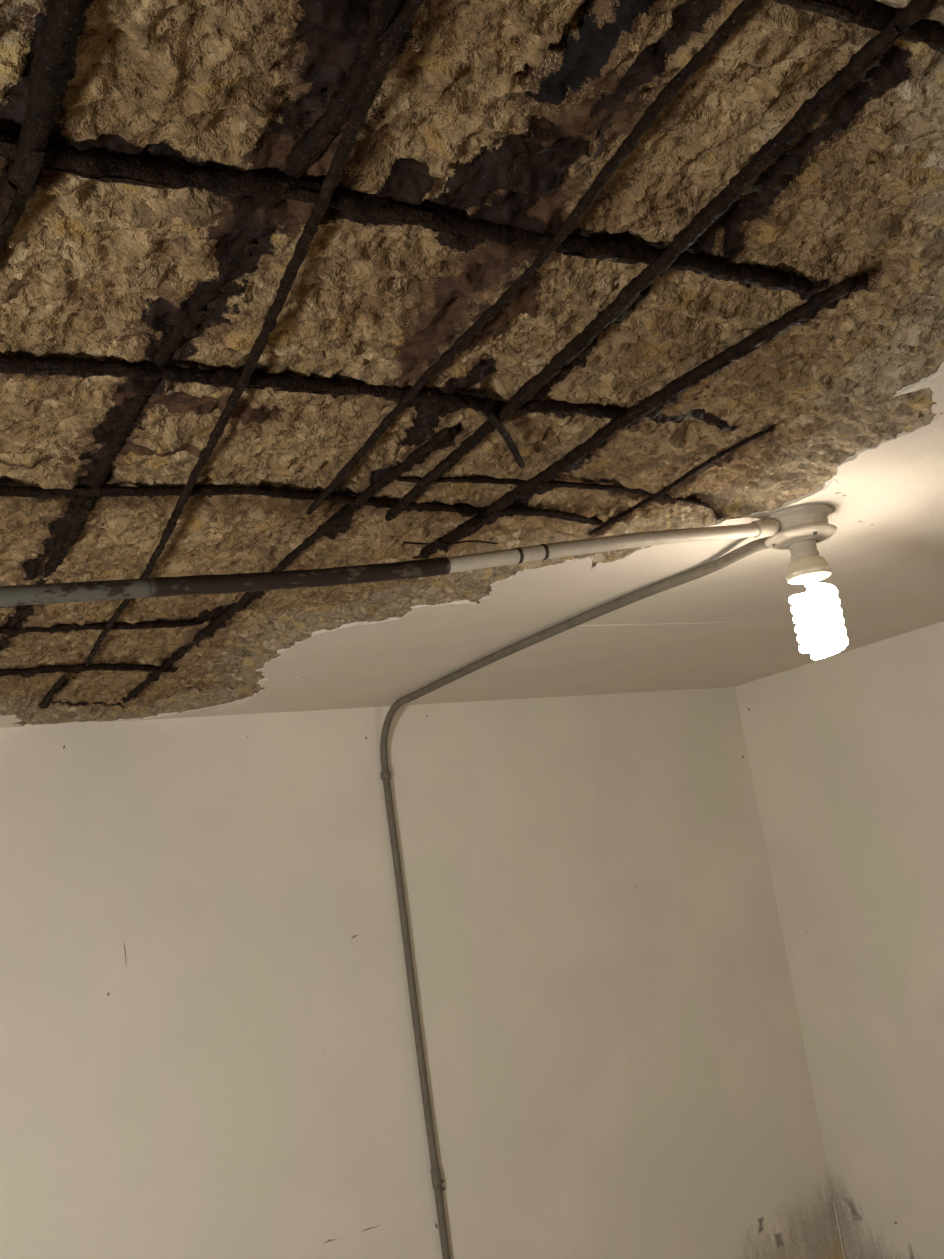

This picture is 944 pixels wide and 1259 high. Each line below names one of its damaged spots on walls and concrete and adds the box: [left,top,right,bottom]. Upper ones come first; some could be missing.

corrosion [0,0,49,134]
corrosion [48,0,443,189]
corrosion [373,0,735,241]
corrosion [687,39,930,274]
corrosion [0,188,403,585]
corrosion [252,231,543,541]
spalling [0,0,944,725]
corrosion [412,379,776,560]
corrosion [528,270,670,419]
corrosion [795,260,890,326]
corrosion [36,590,272,711]
water stain [735,1166,920,1259]